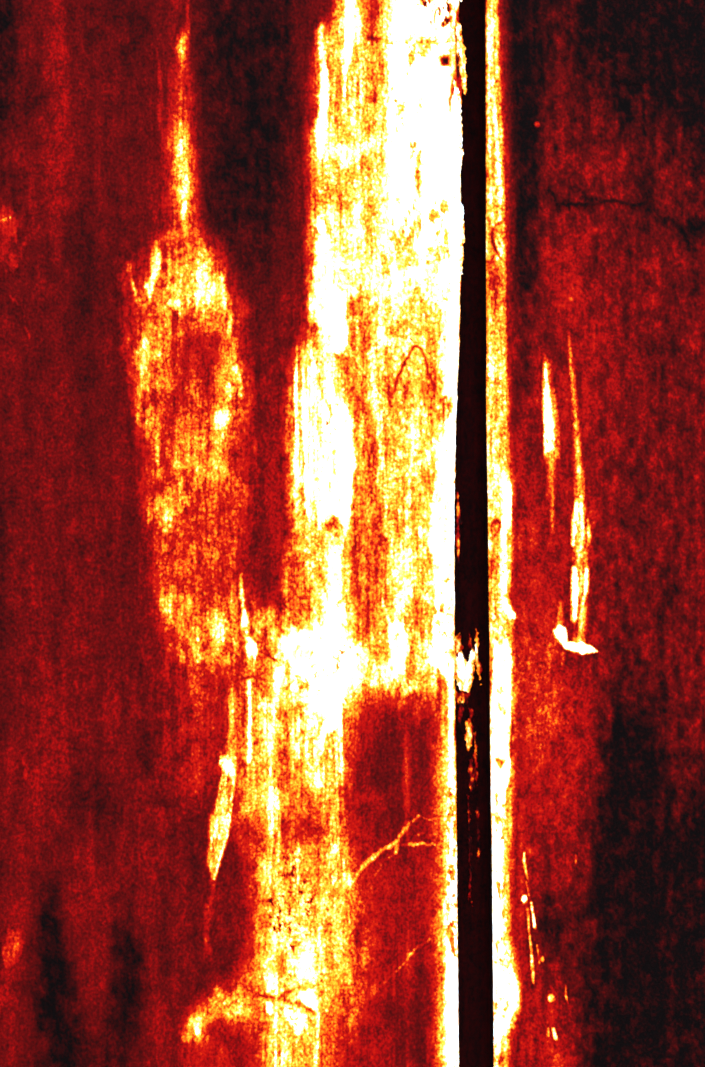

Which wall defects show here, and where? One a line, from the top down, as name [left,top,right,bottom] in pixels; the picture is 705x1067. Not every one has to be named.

rust [114,0,450,1067]
peeling [262,0,524,1067]
peeling [541,329,601,673]
rust [0,921,25,1027]
crack [352,814,441,890]